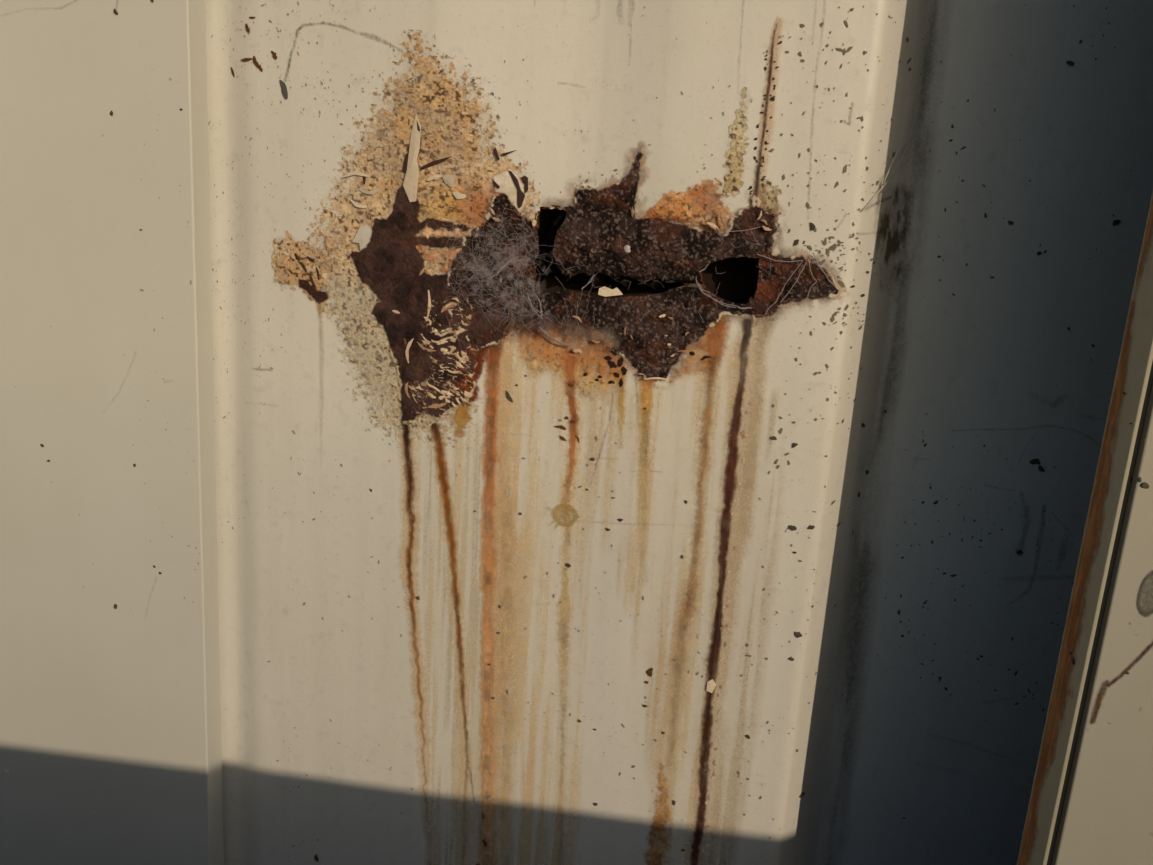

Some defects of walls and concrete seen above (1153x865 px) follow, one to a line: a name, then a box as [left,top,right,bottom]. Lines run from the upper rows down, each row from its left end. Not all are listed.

peeling [493,147,528,210]
corrosion [348,152,843,865]
corrosion [1018,301,1134,865]